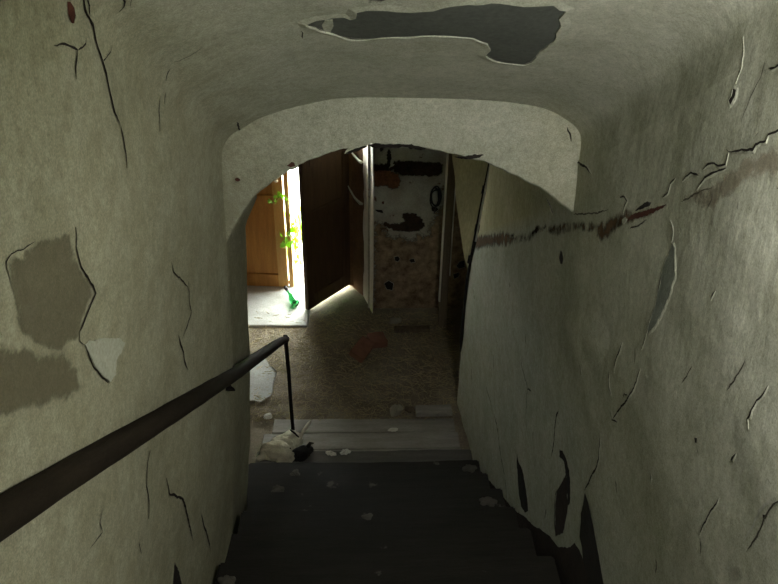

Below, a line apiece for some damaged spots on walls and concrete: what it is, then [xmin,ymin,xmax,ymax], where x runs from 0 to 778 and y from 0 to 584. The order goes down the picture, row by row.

flaking render [296,0,576,66]
crack [53,0,127,162]
flaking render [345,143,443,189]
crack [662,129,778,207]
corrosion [475,226,539,250]
corrosion [549,209,633,240]
peeling [641,220,677,350]
flaking render [504,411,604,584]